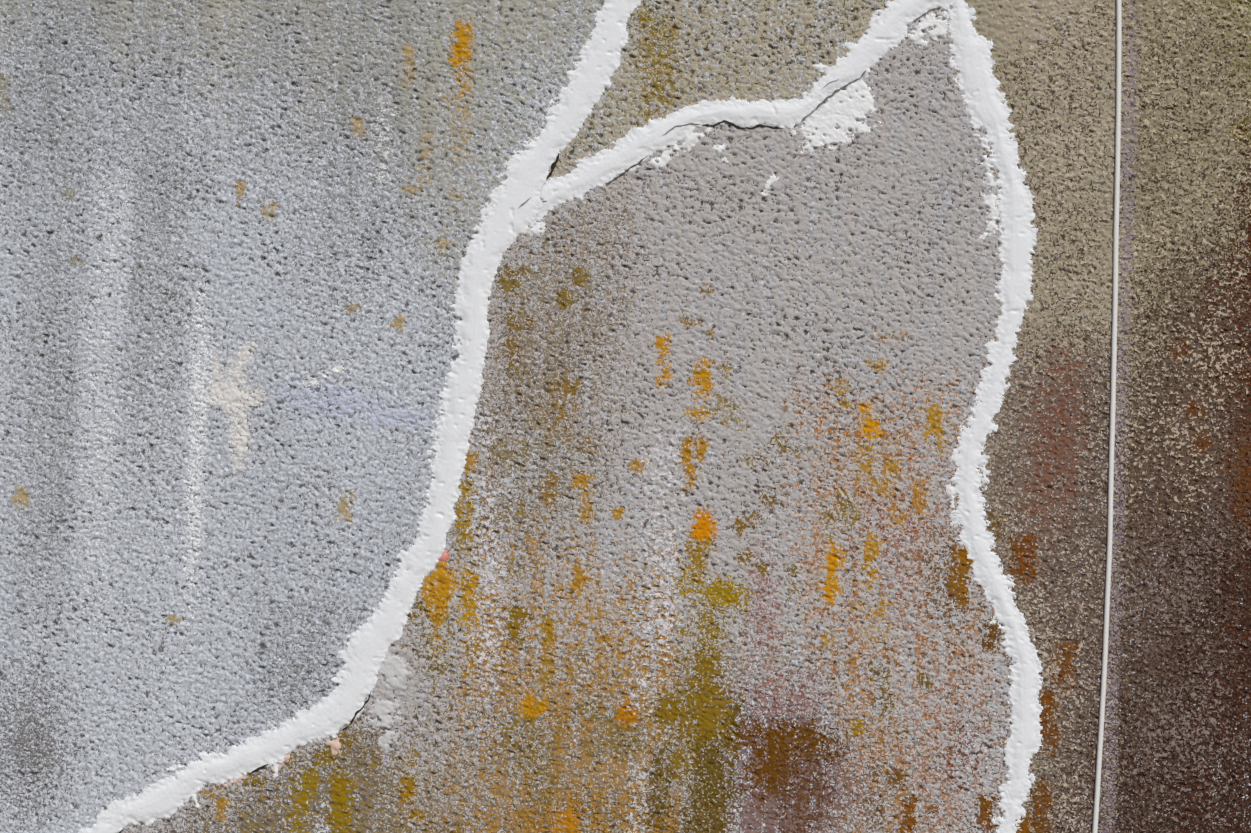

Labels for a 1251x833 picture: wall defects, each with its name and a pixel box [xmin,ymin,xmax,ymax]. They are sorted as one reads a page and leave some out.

rust [348,111,367,139]
rust [398,18,478,199]
rust [390,314,406,338]
crack [78,0,1043,833]
rust [400,306,1056,833]
rust [986,330,1092,590]
rust [1038,636,1081,758]
rust [1168,109,1251,833]